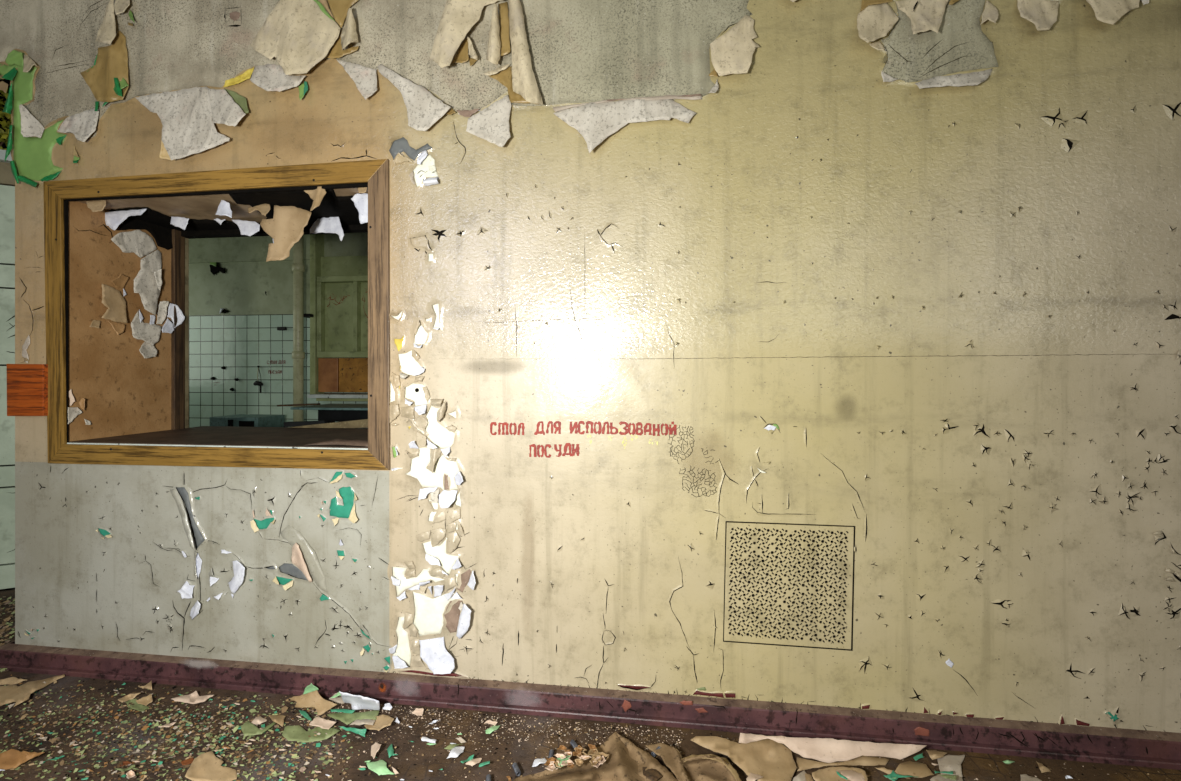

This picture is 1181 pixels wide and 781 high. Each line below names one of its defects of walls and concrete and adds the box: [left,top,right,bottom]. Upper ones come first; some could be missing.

peeling [0,0,759,191]
peeling [857,0,1003,89]
peeling [1017,0,1149,31]
peeling [73,186,368,358]
crack [485,222,636,347]
crack [619,328,702,360]
crack [1074,289,1181,364]
crack [17,465,391,654]
peeling [176,547,256,622]
peeling [343,299,546,685]
crack [463,416,940,714]
crack [857,414,1181,747]